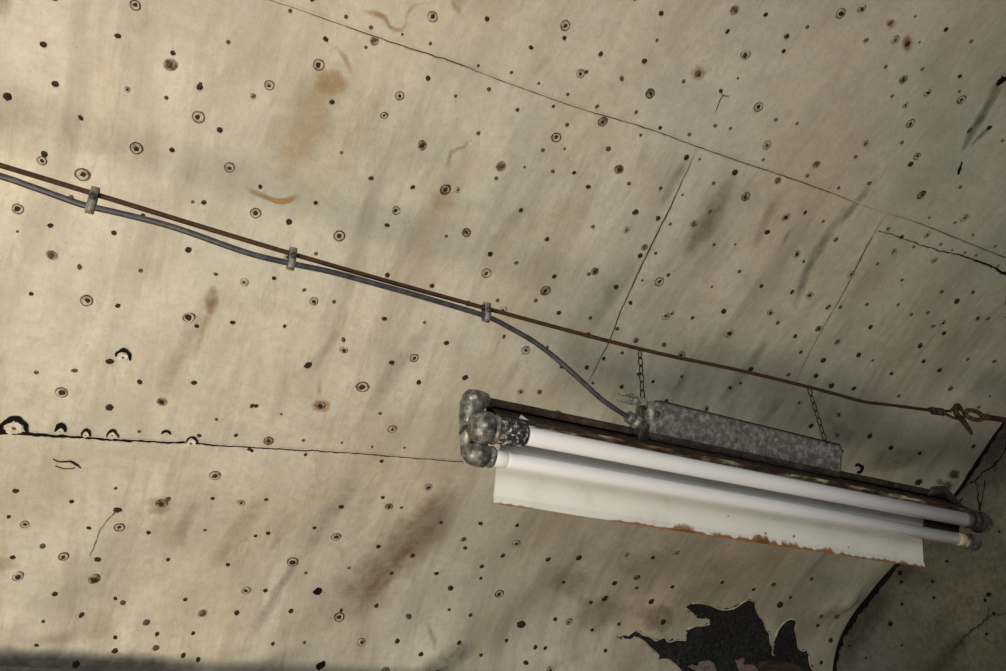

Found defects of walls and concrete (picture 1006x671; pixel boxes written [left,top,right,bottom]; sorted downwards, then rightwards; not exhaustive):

crack [878,230,1006,275]
peeling [617,599,814,671]